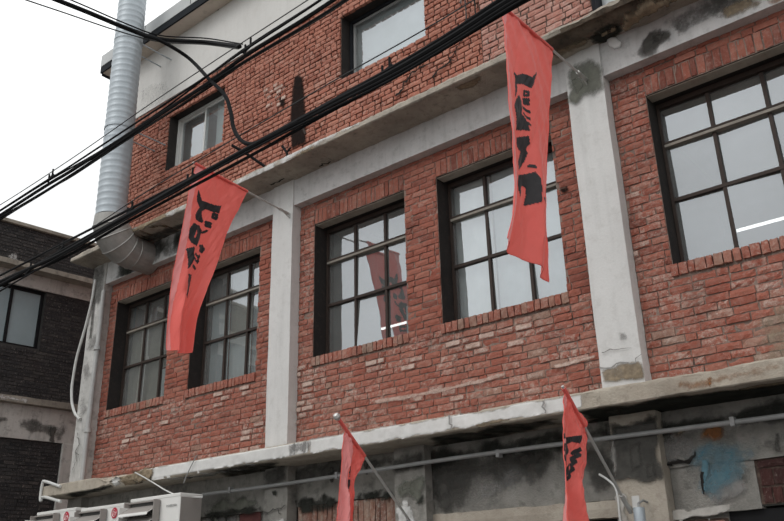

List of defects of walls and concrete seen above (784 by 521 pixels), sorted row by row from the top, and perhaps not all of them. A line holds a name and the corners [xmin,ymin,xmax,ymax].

spalling [554,0,677,58]
damp [675,0,742,30]
crack [599,348,641,370]
damp [23,420,64,442]
damp [580,384,784,493]
mould [295,494,336,513]